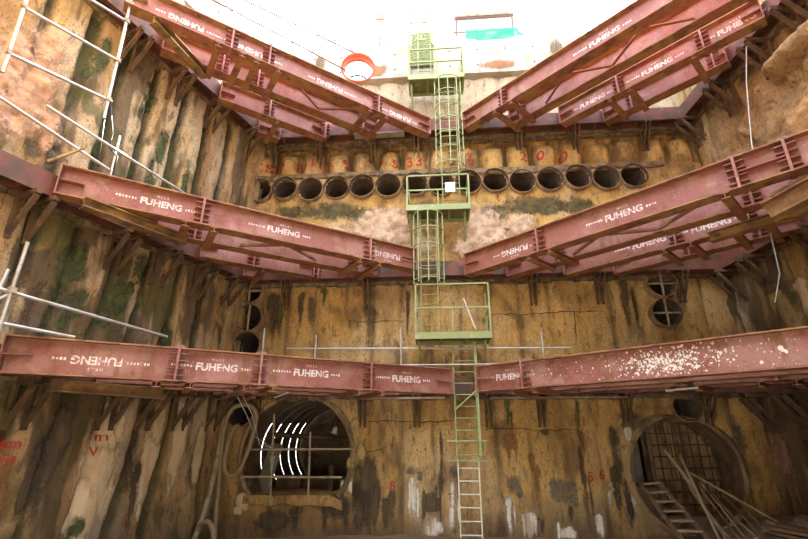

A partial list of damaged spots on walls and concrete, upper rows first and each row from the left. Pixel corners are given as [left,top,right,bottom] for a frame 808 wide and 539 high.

leakage [267,293,283,334]
leakage [298,292,317,326]
leakage [363,304,377,344]
leakage [321,454,396,531]
leakage [407,432,459,536]
leakage [505,477,544,539]
leakage [549,433,604,539]
leakage [607,411,639,525]